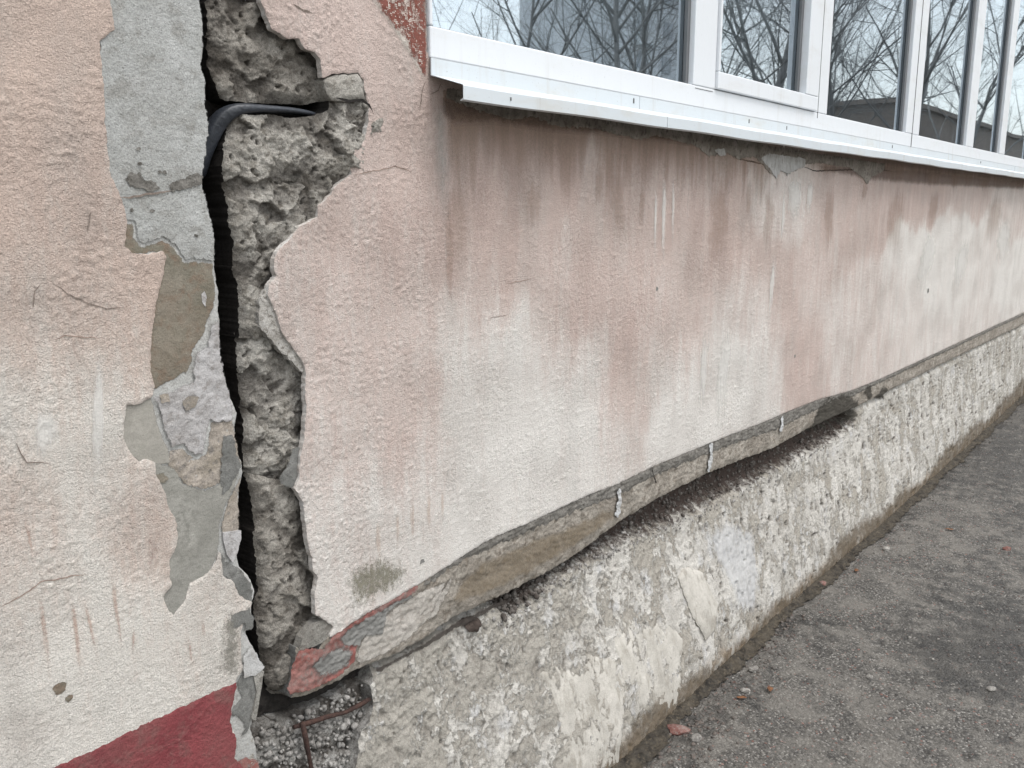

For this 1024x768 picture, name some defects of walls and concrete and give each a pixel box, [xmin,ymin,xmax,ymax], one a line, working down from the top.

crack [204,99,304,121]
water stain [446,101,599,131]
peeling [446,88,885,184]
water stain [873,169,1023,187]
peeling [100,0,451,768]
water stain [348,559,407,603]
crack [257,598,511,716]
corrosion [292,697,371,768]